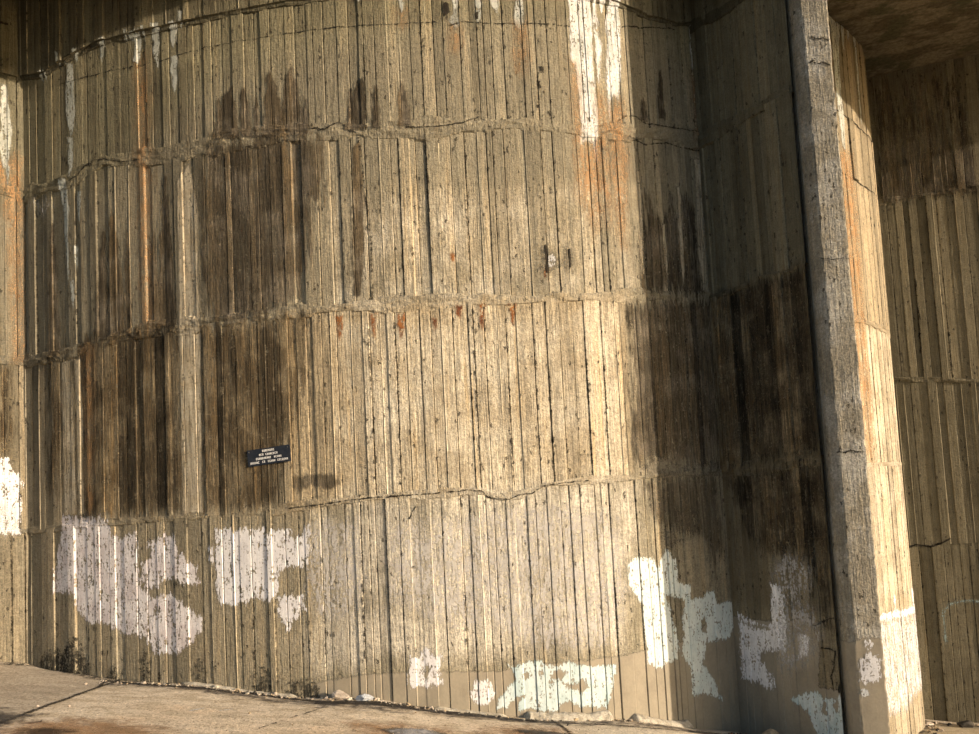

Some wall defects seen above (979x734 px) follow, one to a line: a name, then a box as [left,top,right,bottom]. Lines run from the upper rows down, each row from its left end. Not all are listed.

water stain [0,84,12,184]
corrosion [0,160,22,297]
water stain [123,11,183,92]
water stain [45,48,328,522]
water stain [344,79,381,297]
water stain [397,82,412,127]
water stain [568,0,621,160]
water stain [828,15,862,149]
corrosion [840,153,874,453]
water stain [873,73,979,206]
water stain [625,158,834,630]
crack [909,538,951,548]